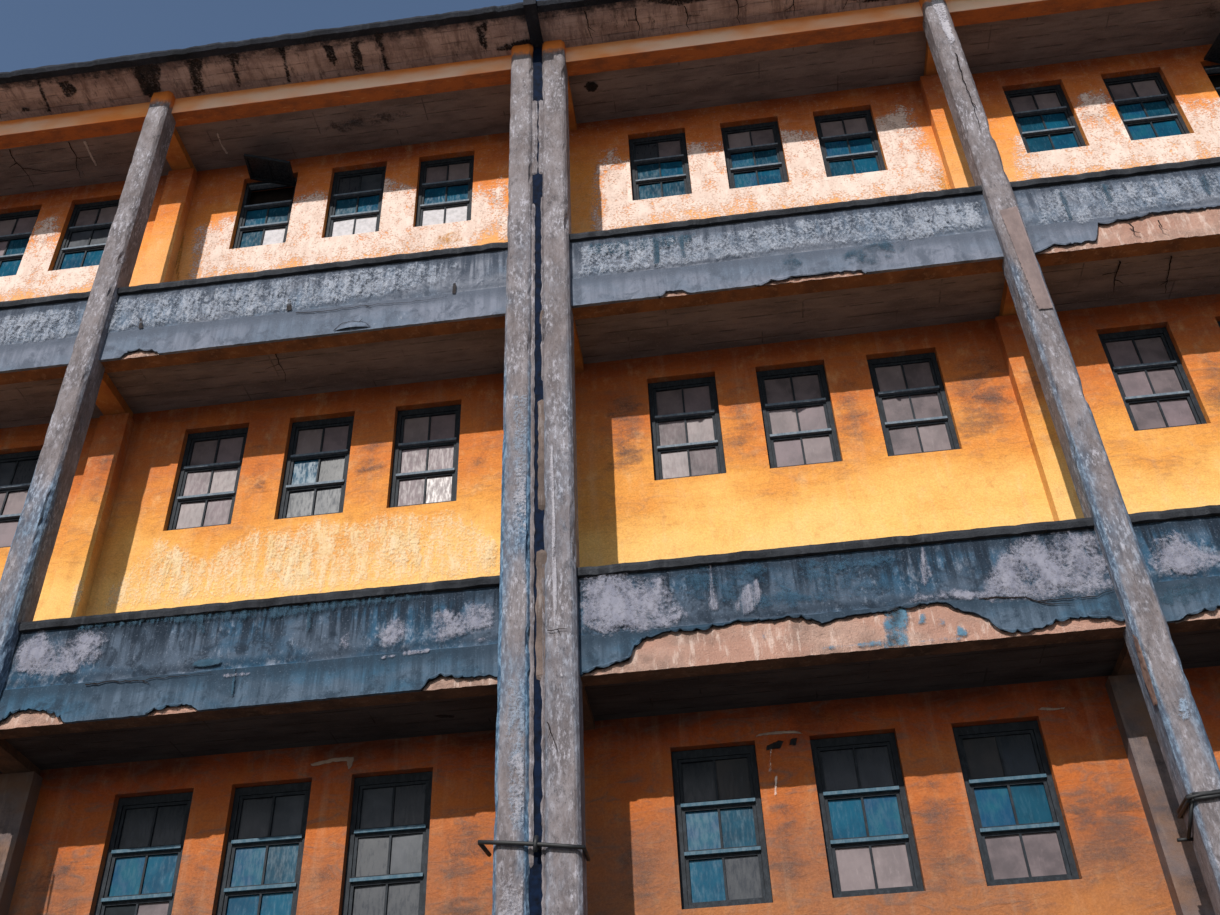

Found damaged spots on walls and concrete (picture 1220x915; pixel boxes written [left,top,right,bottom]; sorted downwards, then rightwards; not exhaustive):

leakage [59,81,77,97]
leakage [131,64,161,98]
leakage [184,58,205,94]
leakage [278,47,291,82]
leakage [322,45,337,66]
leakage [350,41,364,72]
leakage [374,32,390,70]
peeling [1000,90,1220,309]
peeling [550,446,558,643]
spalling [582,533,1158,706]
spalling [0,708,65,730]
spalling [145,703,198,716]